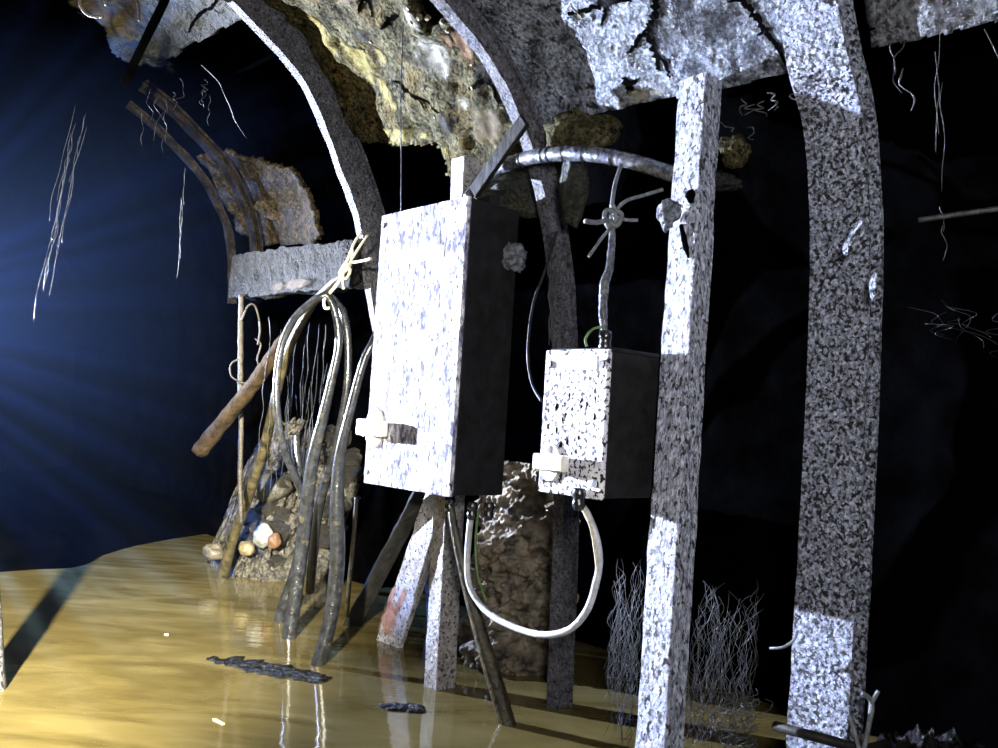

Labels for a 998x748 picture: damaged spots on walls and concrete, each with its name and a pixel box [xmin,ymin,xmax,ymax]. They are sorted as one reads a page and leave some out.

spalling [404,4,451,34]
spalling [469,63,486,90]
crack [567,0,671,98]
crack [727,0,786,67]